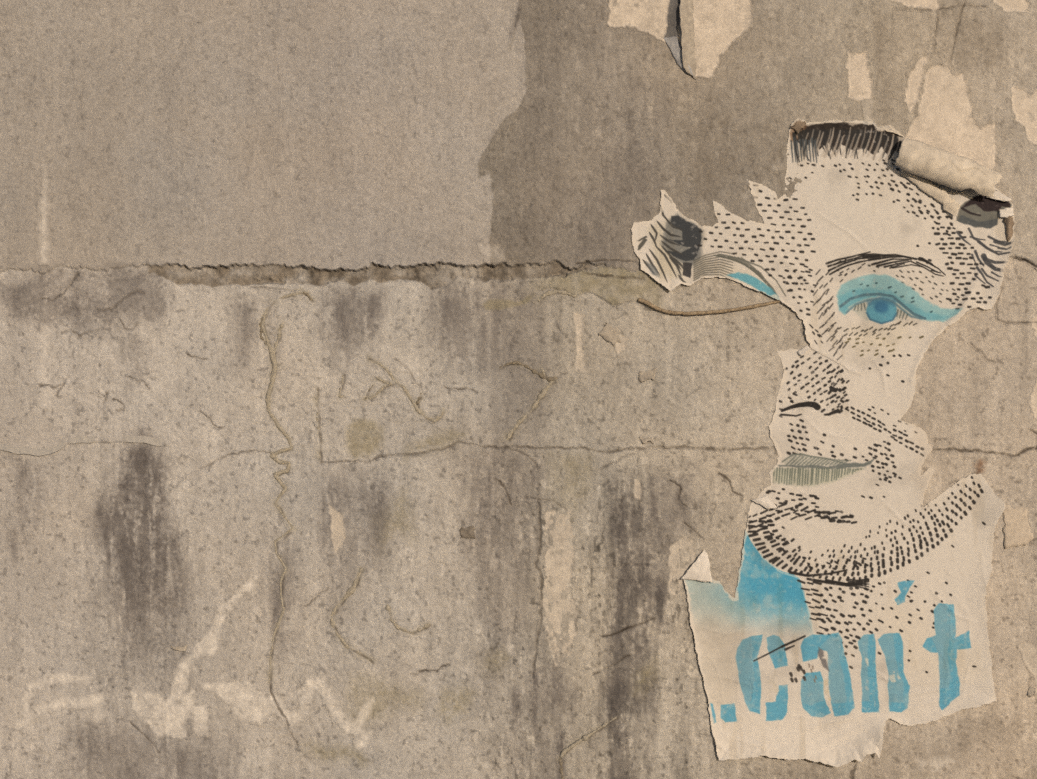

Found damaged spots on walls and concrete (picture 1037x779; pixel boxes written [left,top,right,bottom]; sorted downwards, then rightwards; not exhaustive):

spalling [888,0,941,9]
spalling [992,0,1032,13]
spalling [607,0,755,79]
spalling [845,50,873,102]
spalling [903,54,999,170]
spalling [1010,83,1037,146]
crack [39,271,79,302]
crack [538,258,644,305]
crack [931,428,1037,459]
leakage [421,277,714,779]
leakage [81,424,202,692]